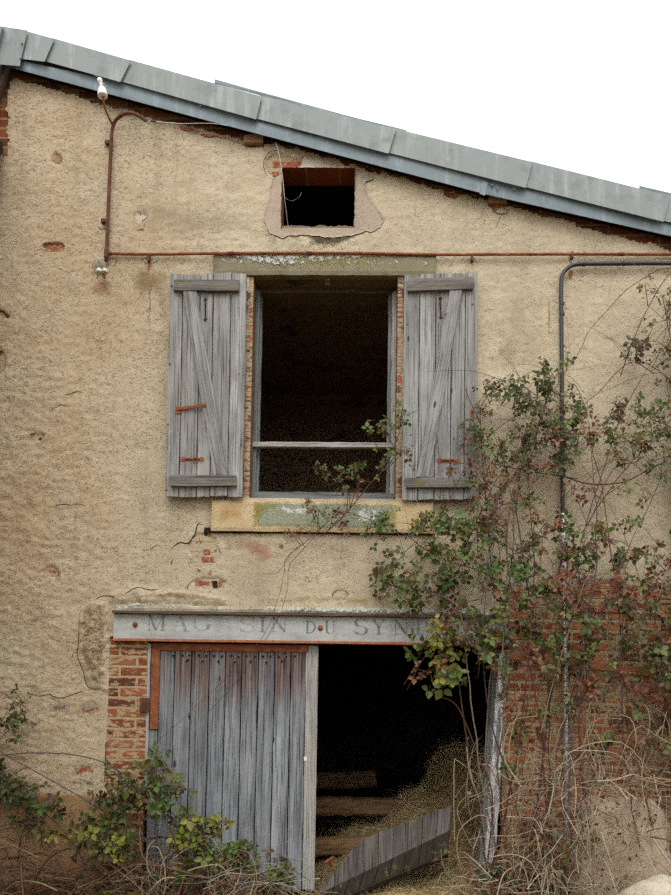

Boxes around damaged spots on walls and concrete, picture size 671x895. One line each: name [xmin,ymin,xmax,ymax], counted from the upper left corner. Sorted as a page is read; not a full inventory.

peeling [223,153,397,266]
peeling [40,241,65,252]
crack [148,523,202,588]
flaking render [188,527,225,589]